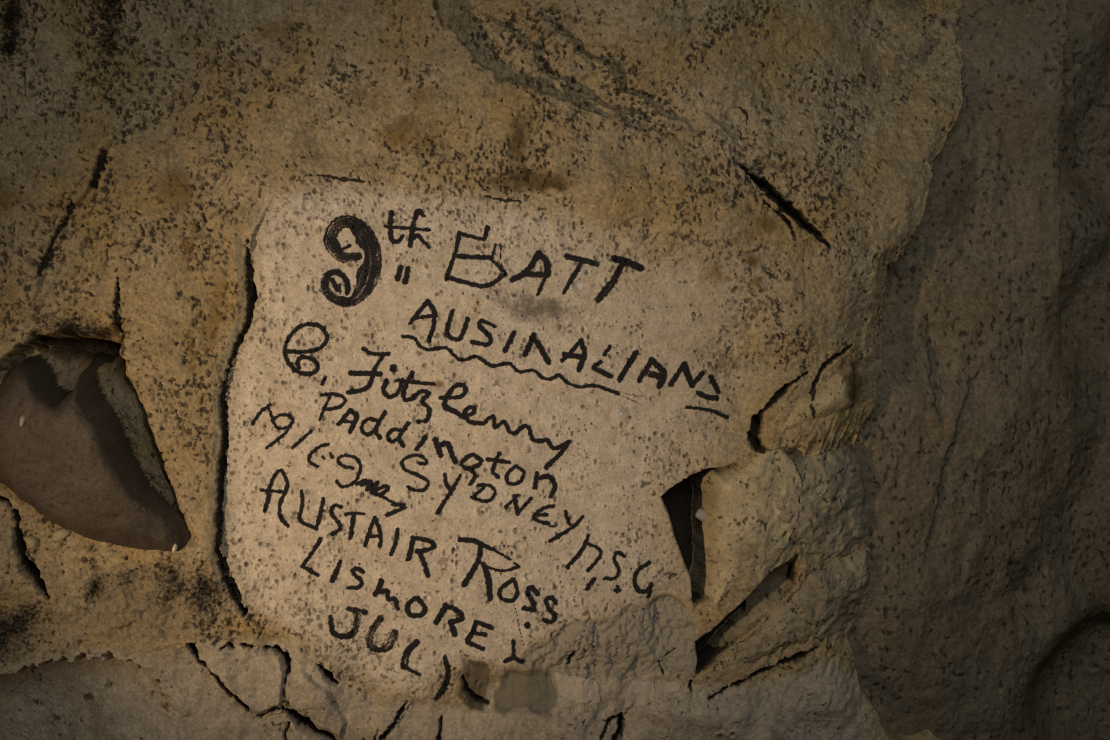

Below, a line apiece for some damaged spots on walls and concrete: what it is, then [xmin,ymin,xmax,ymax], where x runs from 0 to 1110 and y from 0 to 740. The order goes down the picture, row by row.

crack [37,149,108,276]
crack [305,174,366,183]
crack [485,195,521,203]
crack [736,163,829,247]
crack [215,239,257,616]
crack [0,495,50,599]
crack [190,642,338,740]
crack [462,675,489,705]
crack [658,647,816,700]
crack [364,701,408,740]
crack [436,715,444,740]
crack [600,712,623,740]